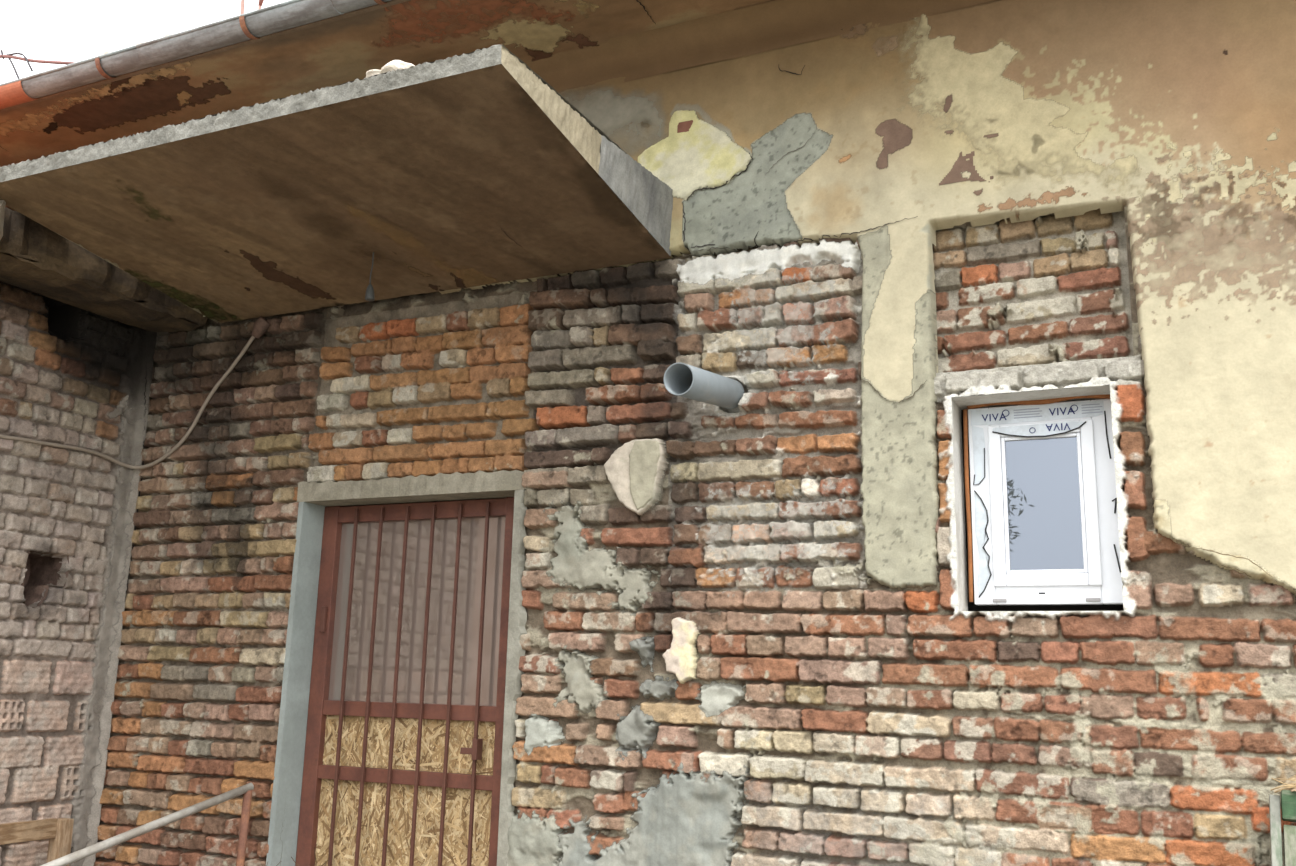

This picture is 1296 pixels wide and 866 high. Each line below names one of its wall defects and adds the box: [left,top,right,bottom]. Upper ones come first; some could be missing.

flaking render [0,61,231,137]
flaking render [638,110,851,257]
peeling [876,119,912,169]
peeling [904,14,1296,329]
flaking render [857,226,940,589]
flaking render [1153,499,1296,596]